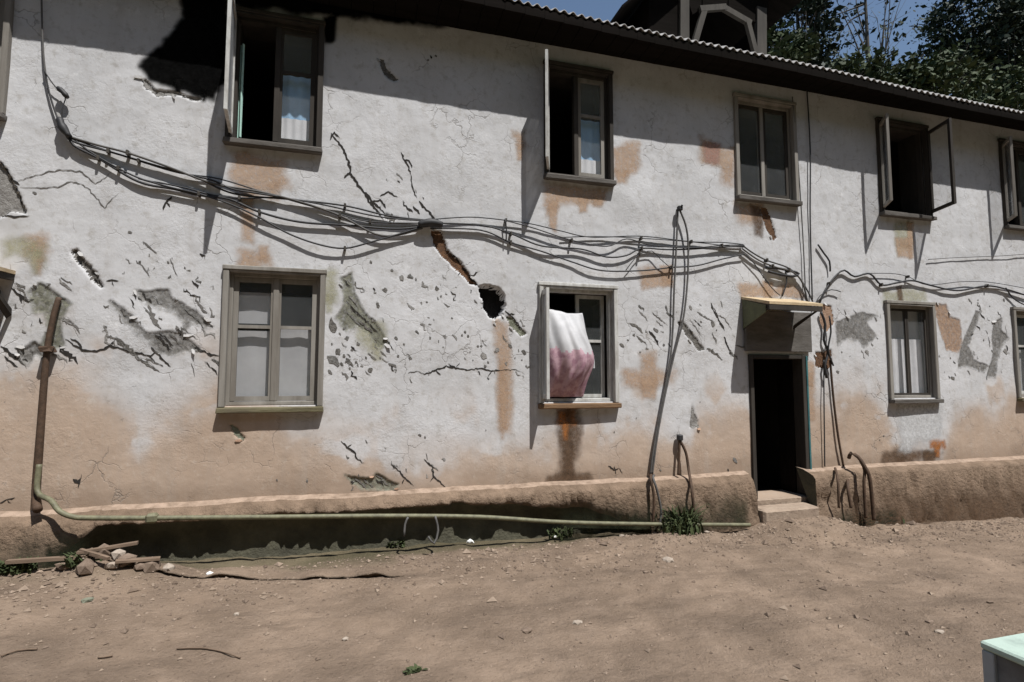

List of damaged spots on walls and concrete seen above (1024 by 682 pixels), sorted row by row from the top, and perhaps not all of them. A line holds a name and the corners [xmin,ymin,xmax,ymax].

crack [0,162,118,218]
crack [330,132,435,220]
corrosion [739,205,763,237]
spalling [71,250,103,288]
spalling [103,261,219,376]
spalling [327,273,412,381]
spalling [391,227,530,380]
crack [409,363,523,376]
spalling [814,303,885,374]
spalling [935,298,1010,380]
damp [547,409,592,482]
corrosion [930,440,945,457]